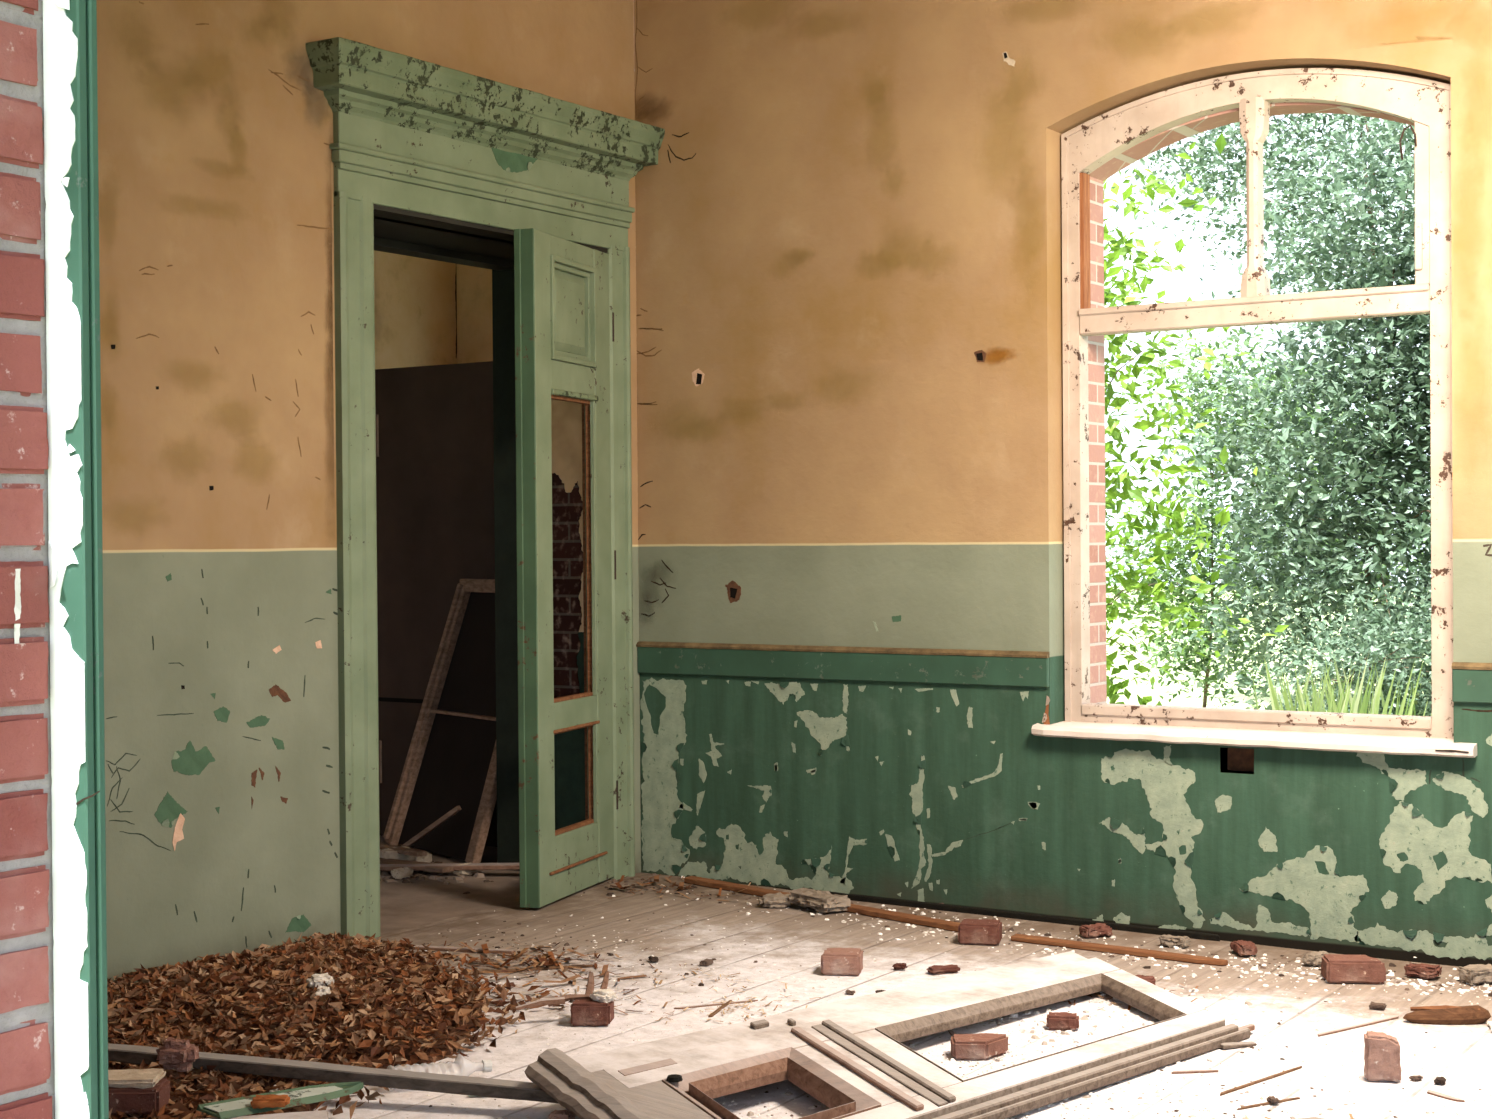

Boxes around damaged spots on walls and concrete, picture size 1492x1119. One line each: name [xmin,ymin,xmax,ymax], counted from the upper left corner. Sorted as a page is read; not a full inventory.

peeling [492,148,537,173]
spalling [974,350,986,362]
spalling [889,687,973,728]
peeling [640,677,900,894]
peeling [948,741,1003,800]
spalling [1011,786,1040,825]
peeling [897,755,963,902]
peeling [1100,745,1492,960]
spalling [1092,912,1130,924]